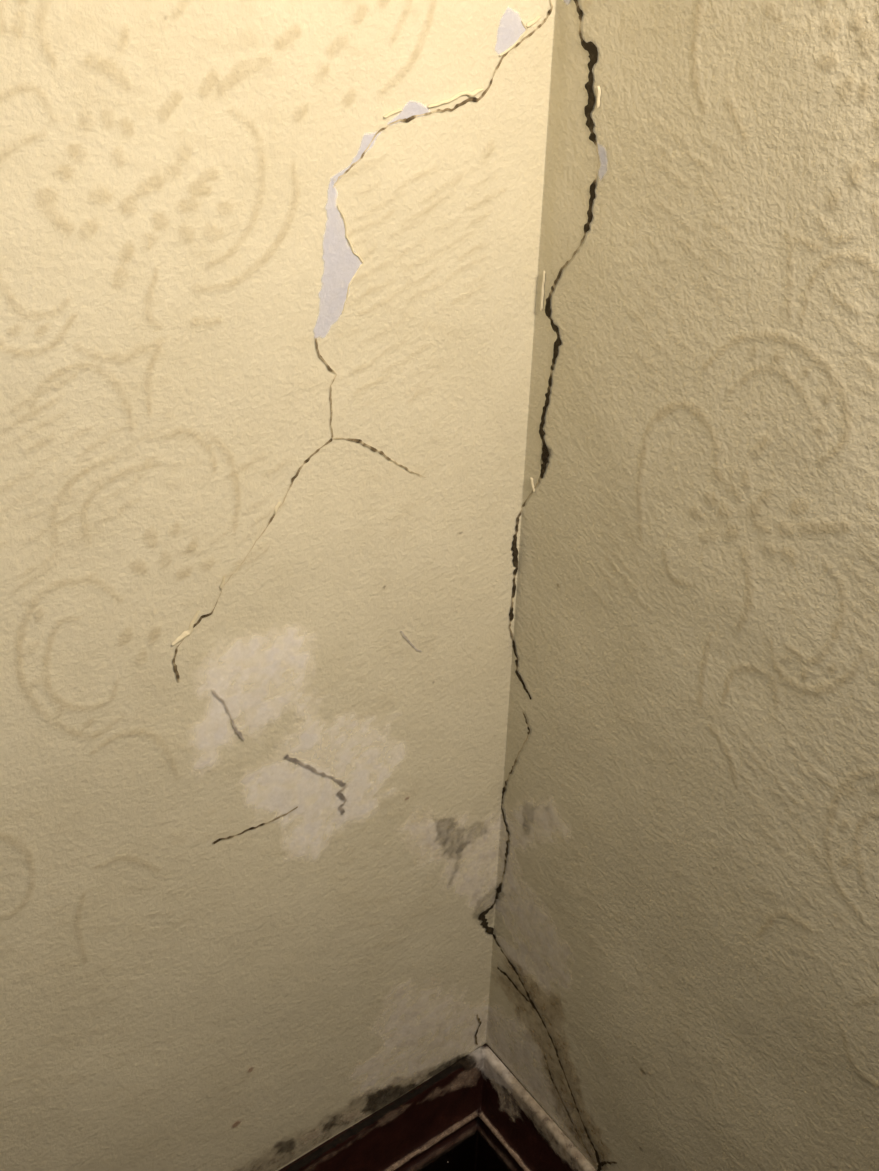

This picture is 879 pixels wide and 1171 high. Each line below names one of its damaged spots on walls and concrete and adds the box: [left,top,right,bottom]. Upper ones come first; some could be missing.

peeling [495,8,527,56]
peeling [314,101,429,338]
crack [172,338,426,682]
crack [333,0,617,1171]
crack [213,806,298,844]
spalling [247,727,385,845]